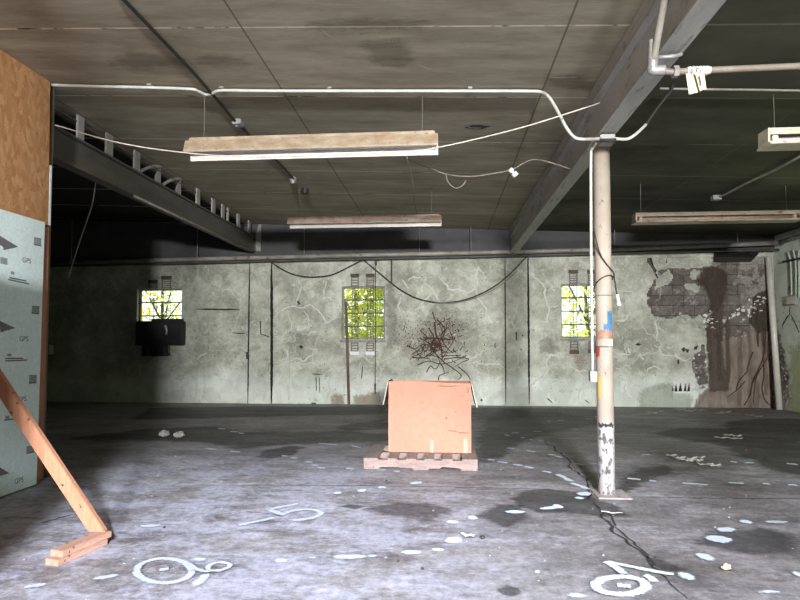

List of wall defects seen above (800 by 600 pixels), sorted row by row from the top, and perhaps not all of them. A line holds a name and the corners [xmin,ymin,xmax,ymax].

crack [270,263,365,412]
crack [397,261,589,404]
crack [647,258,658,278]
crack [616,321,698,393]
peeling [677,344,708,389]
peeling [647,252,768,341]
water stain [696,267,730,392]
water stain [749,290,769,348]
water stain [478,505,527,526]
crack [545,440,688,599]